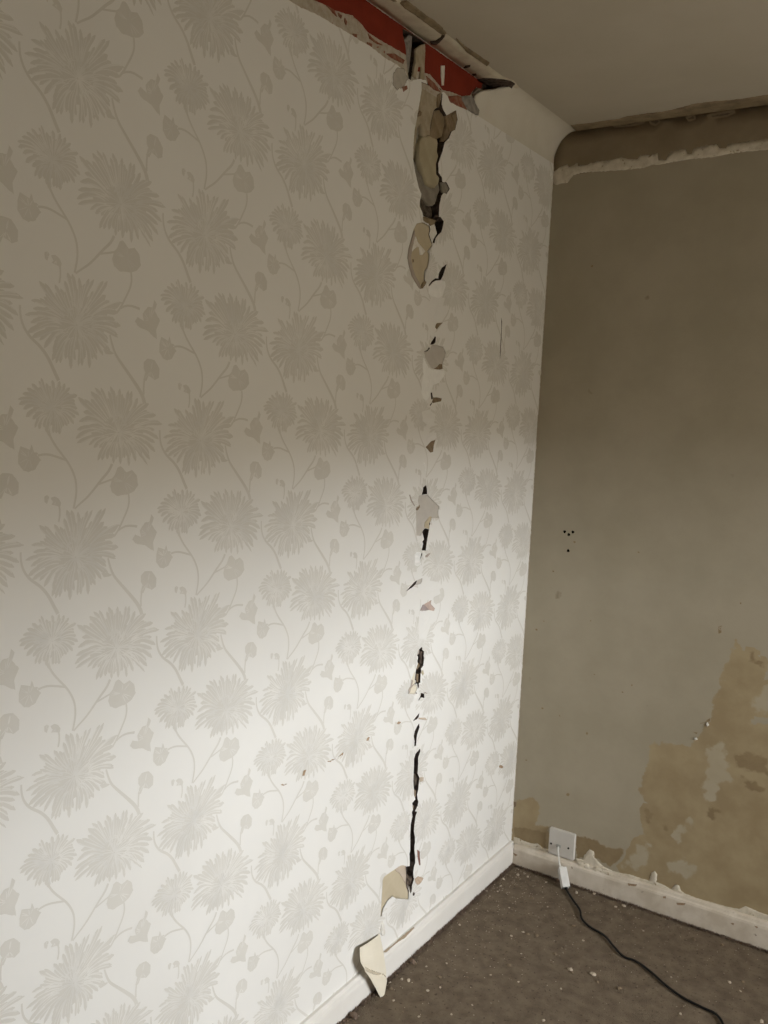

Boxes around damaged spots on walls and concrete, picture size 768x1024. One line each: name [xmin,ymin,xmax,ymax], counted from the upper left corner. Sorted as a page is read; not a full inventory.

spalling [411,44,458,226]
crack [424,215,447,286]
crack [408,523,430,590]
crack [406,647,424,893]